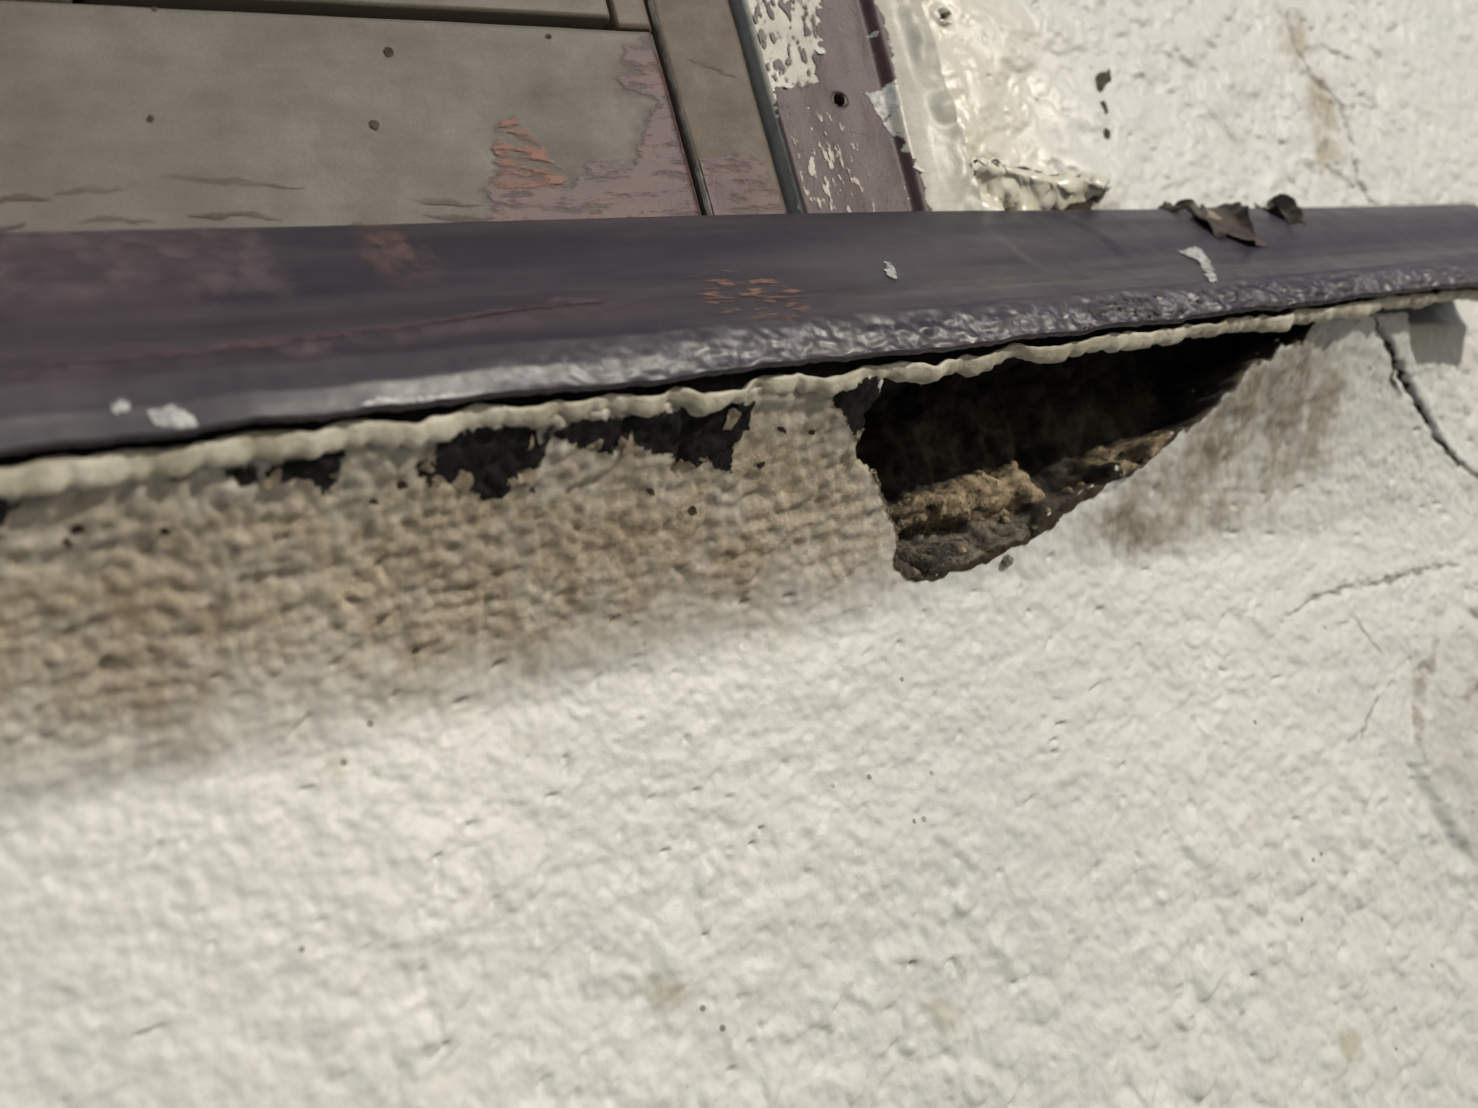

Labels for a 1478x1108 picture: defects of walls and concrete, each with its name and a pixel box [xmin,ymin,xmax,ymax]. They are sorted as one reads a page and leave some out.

peeling [482,0,932,221]
peeling [973,156,1112,211]
peeling [959,246,1270,336]
peeling [0,496,26,526]
peeling [148,404,197,429]
peeling [219,450,346,496]
peeling [361,379,498,406]
peeling [397,401,756,501]
spalling [832,322,1316,582]
crack [1374,318,1478,482]
damp [0,407,884,716]
crack [1311,566,1440,598]